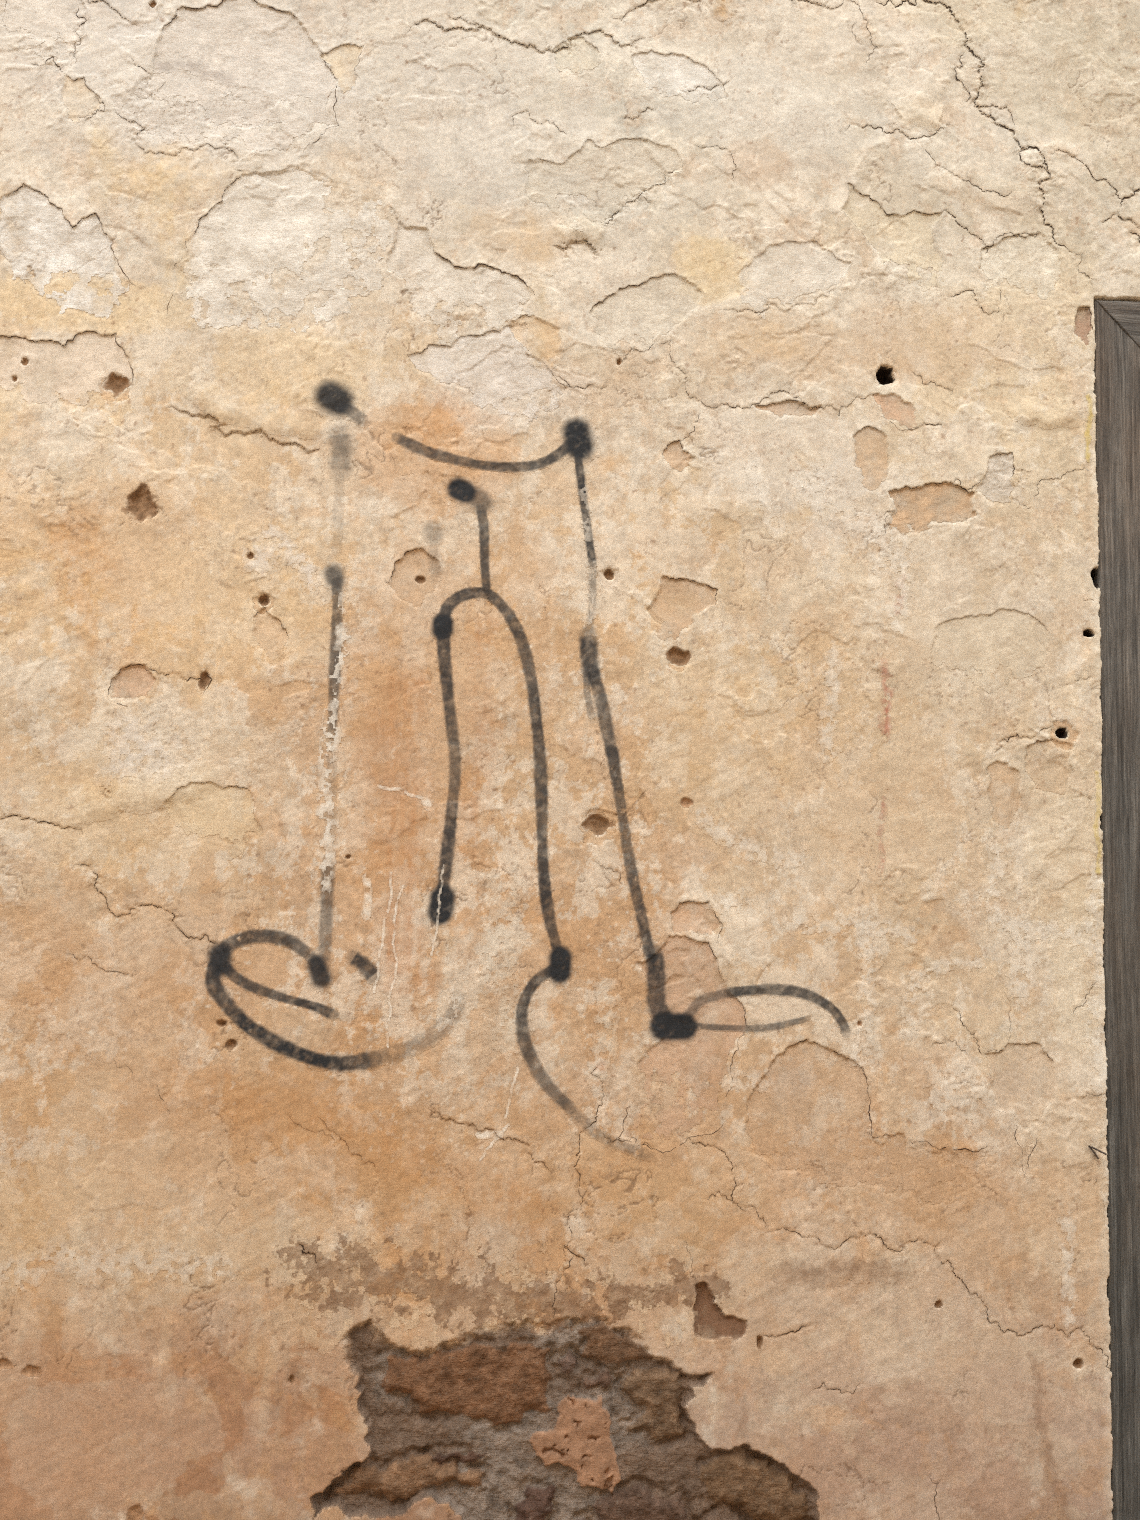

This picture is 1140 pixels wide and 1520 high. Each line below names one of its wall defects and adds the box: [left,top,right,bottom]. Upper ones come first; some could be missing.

crack [34,0,241,171]
crack [416,0,698,53]
crack [555,146,736,252]
crack [792,0,1140,278]
crack [557,341,880,441]
spalling [853,368,1015,534]
crack [431,1068,654,1318]
crack [689,1138,1109,1368]
spalling [271,1231,820,1520]